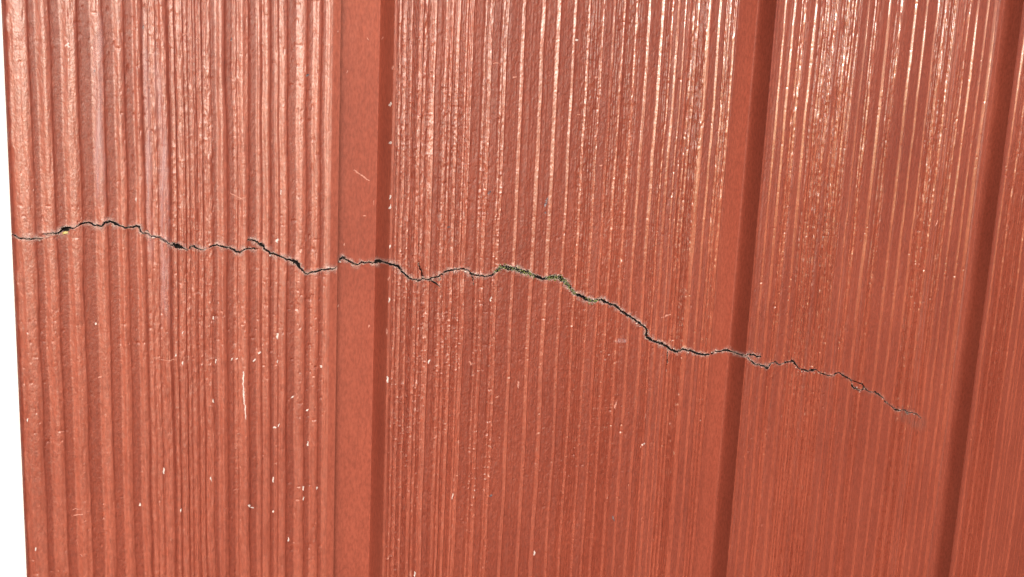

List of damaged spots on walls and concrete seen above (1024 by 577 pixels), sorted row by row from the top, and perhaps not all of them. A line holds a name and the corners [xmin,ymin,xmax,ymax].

crack [12,220,921,418]